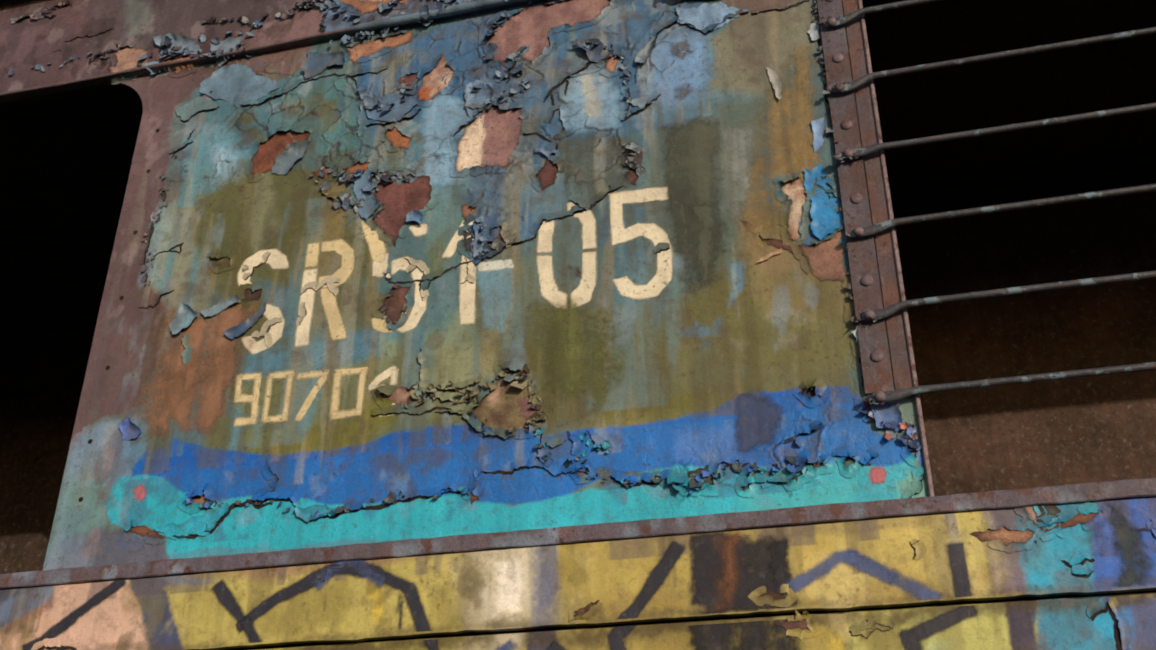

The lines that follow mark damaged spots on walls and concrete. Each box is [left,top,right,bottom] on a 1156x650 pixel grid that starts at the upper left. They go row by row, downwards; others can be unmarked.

peeling [675,2,748,32]
peeling [31,0,478,121]
peeling [245,125,316,183]
peeling [309,0,660,247]
peeling [739,0,877,342]
peeling [457,198,510,261]
peeling [169,282,266,339]
peeling [371,360,613,484]
peeling [793,377,827,408]
peeling [652,447,887,498]
peeling [120,483,405,546]
peeling [970,502,1111,553]